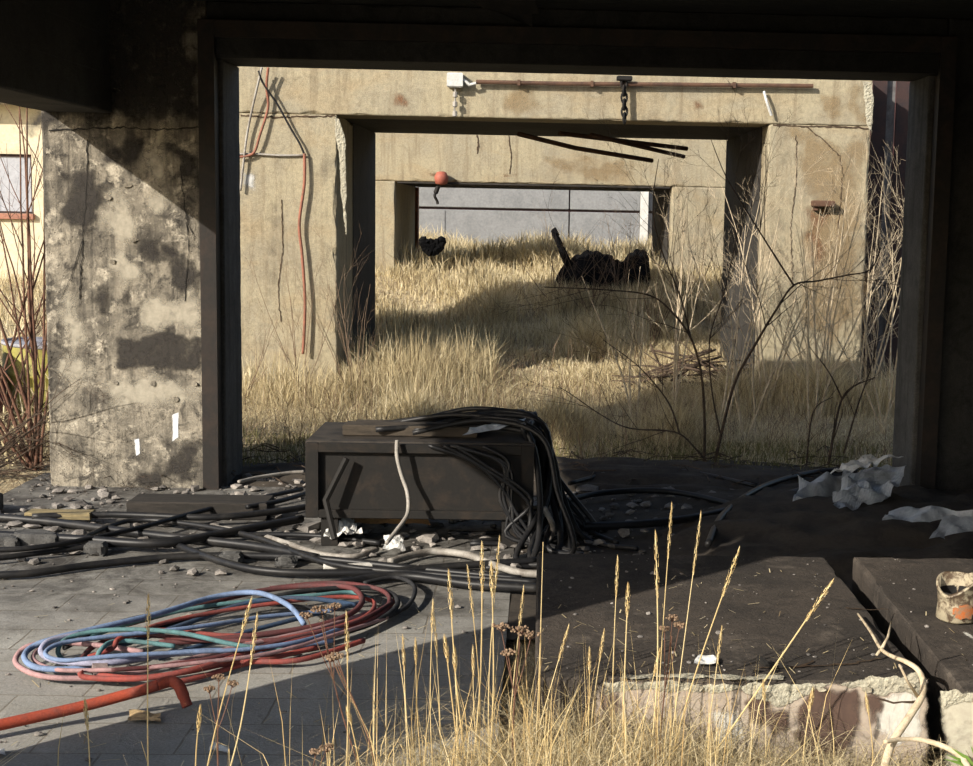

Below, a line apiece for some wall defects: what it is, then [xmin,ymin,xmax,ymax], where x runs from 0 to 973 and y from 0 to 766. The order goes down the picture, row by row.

leakage [104,138,144,174]
leakage [166,144,199,182]
leakage [60,171,103,233]
crack [49,126,199,301]
leakage [140,240,200,297]
leakage [95,287,109,314]
leakage [116,332,201,370]